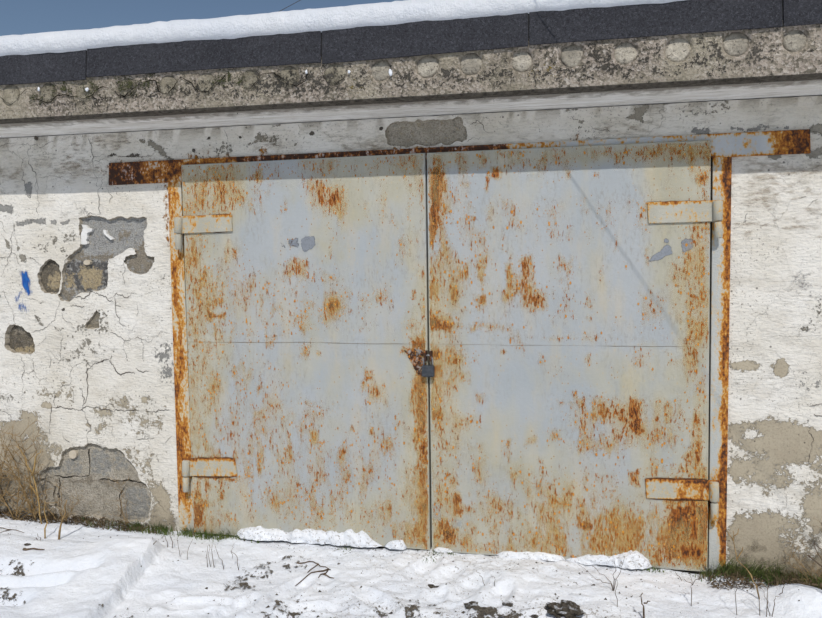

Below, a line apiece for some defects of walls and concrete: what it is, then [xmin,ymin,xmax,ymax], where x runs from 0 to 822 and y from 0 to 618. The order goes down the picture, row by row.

crack [2,134,147,217]
spalling [379,117,468,148]
spalling [0,204,154,314]
spalling [4,324,35,354]
crack [2,263,170,466]
rust [182,135,711,570]
spalling [0,382,177,531]
peeling [726,414,822,581]